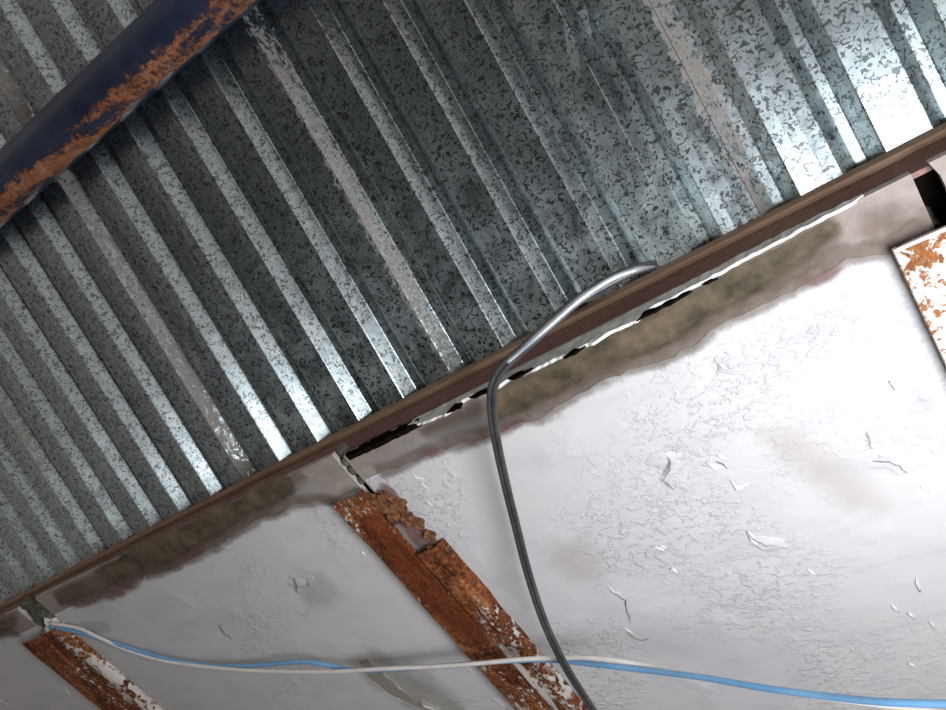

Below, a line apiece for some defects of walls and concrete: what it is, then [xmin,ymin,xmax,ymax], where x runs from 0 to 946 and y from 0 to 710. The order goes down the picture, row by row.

corrosion [0,0,255,225]
spalling [447,387,488,414]
spalling [507,367,534,380]
spalling [563,346,586,359]
damp [378,220,928,475]
spalling [636,290,692,322]
corrosion [898,232,946,361]
corrosion [332,485,588,710]
corrosion [22,626,156,710]
peeling [358,658,442,710]